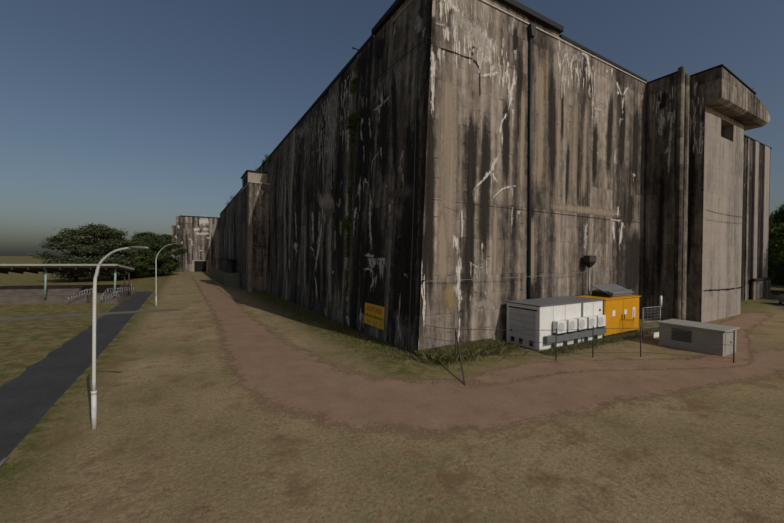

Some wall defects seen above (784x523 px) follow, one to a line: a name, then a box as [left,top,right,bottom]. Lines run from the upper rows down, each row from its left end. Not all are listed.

crack [441,48,481,95]
damp [257,0,676,341]
damp [687,82,704,273]
damp [741,168,770,275]